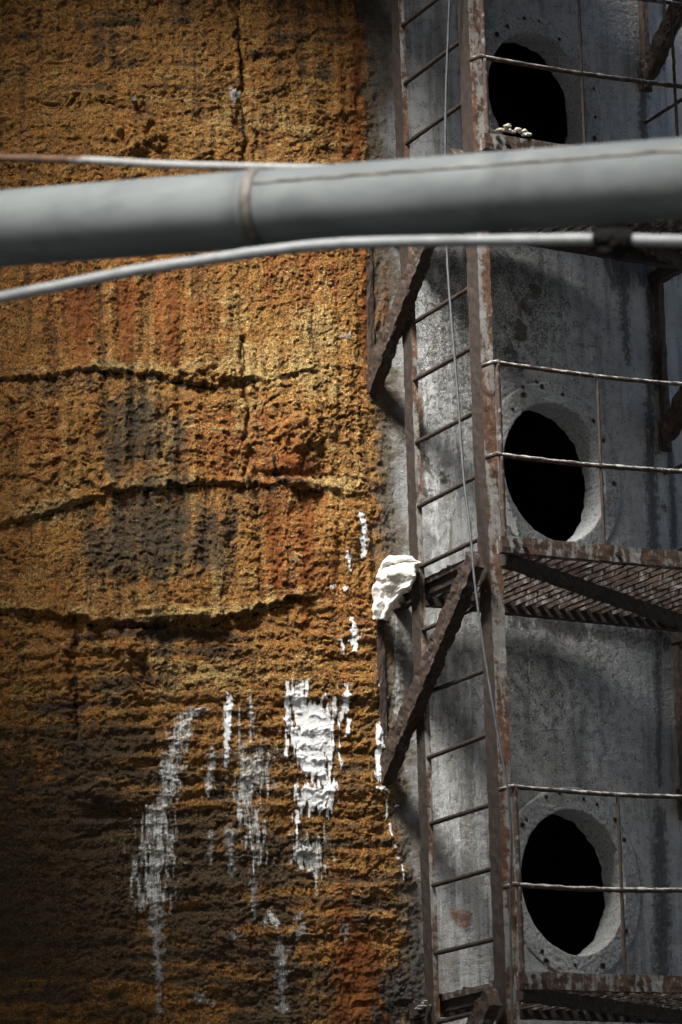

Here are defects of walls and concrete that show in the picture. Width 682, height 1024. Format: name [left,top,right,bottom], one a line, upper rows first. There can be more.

crack [236,2,257,148]
crack [0,342,317,402]
crack [17,475,344,524]
crack [57,606,282,731]
damp [130,707,204,976]
damp [205,679,352,883]